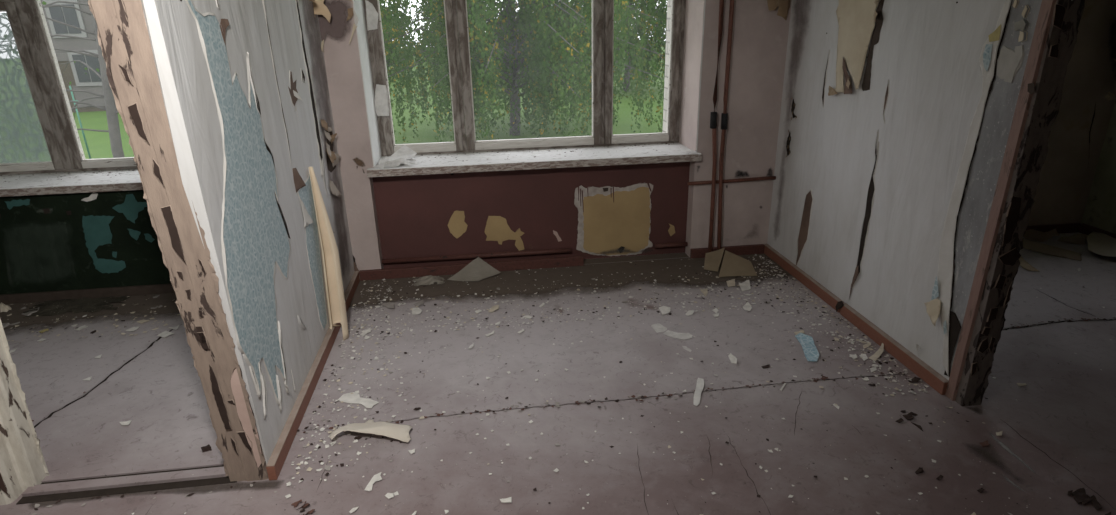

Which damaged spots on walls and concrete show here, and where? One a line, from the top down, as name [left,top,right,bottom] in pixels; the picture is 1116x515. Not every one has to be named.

peeling [82,194,155,273]
peeling [447,210,468,239]
peeling [484,215,525,251]
peeling [574,181,654,256]
flaking render [949,0,1066,377]
crack [1002,288,1116,330]
crack [32,323,182,428]
crack [297,370,911,436]
peeling [0,467,10,496]